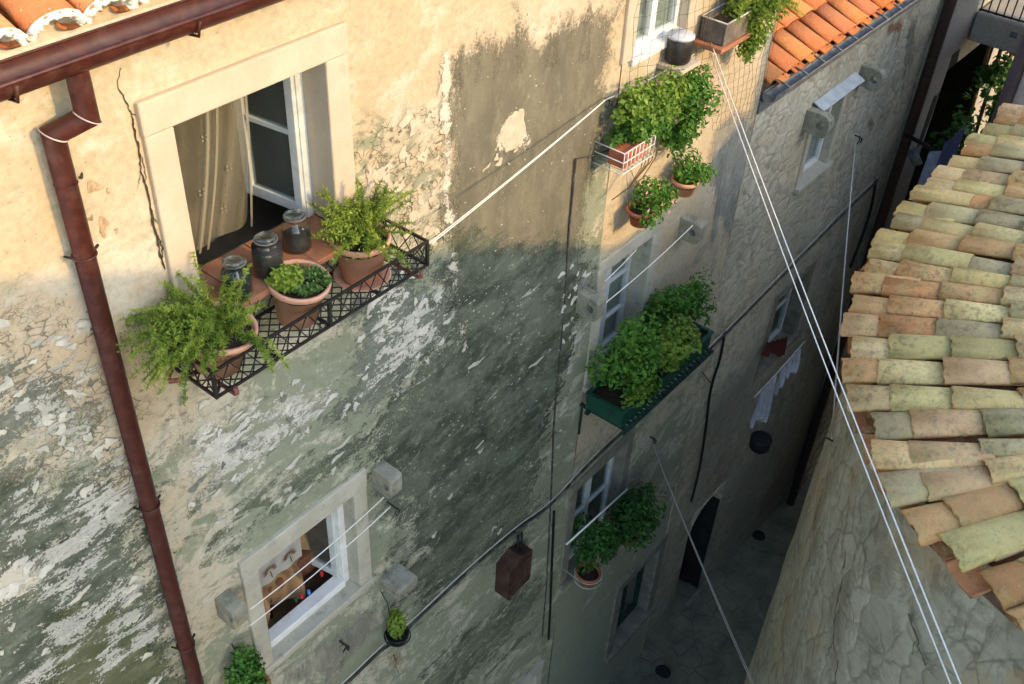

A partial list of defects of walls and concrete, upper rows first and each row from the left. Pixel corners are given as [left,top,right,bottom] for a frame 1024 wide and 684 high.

crack [117,68,166,269]
flaking render [482,109,531,172]
water stain [435,3,624,313]
water stain [709,111,752,241]
peeling [0,294,132,504]
peeling [150,110,462,511]
peeling [0,550,55,605]
peeling [66,585,91,606]
water stain [0,455,166,684]
peeling [121,575,142,623]